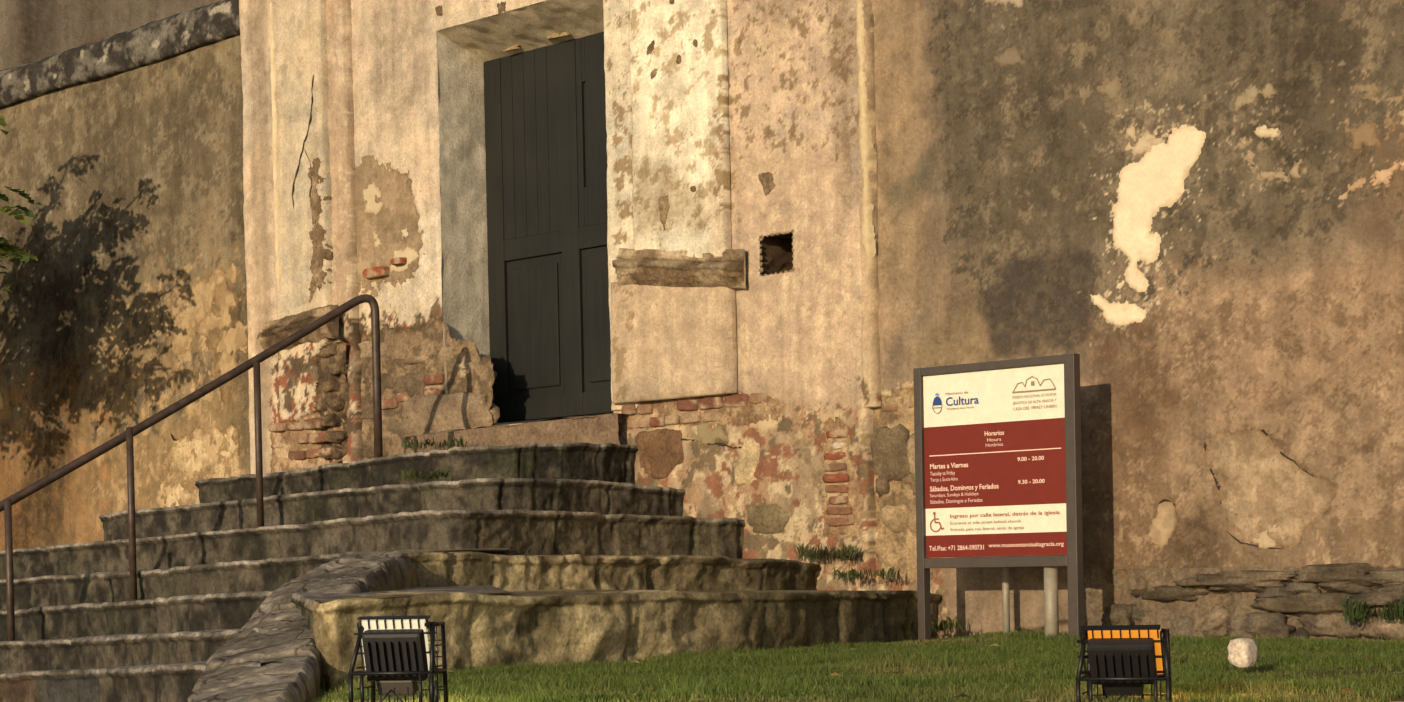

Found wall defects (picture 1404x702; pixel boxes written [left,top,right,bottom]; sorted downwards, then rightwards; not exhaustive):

crack [292,75,332,303]
flaking render [355,155,425,297]
peeling [1090,124,1206,328]
spalling [1350,120,1381,151]
spalling [1353,83,1380,100]
peeling [1338,161,1404,201]
water stain [987,256,1091,354]
water stain [16,264,88,540]
flaking render [268,316,500,473]
flaking render [621,392,786,485]
flaking render [747,504,790,534]
flaking render [822,417,864,538]